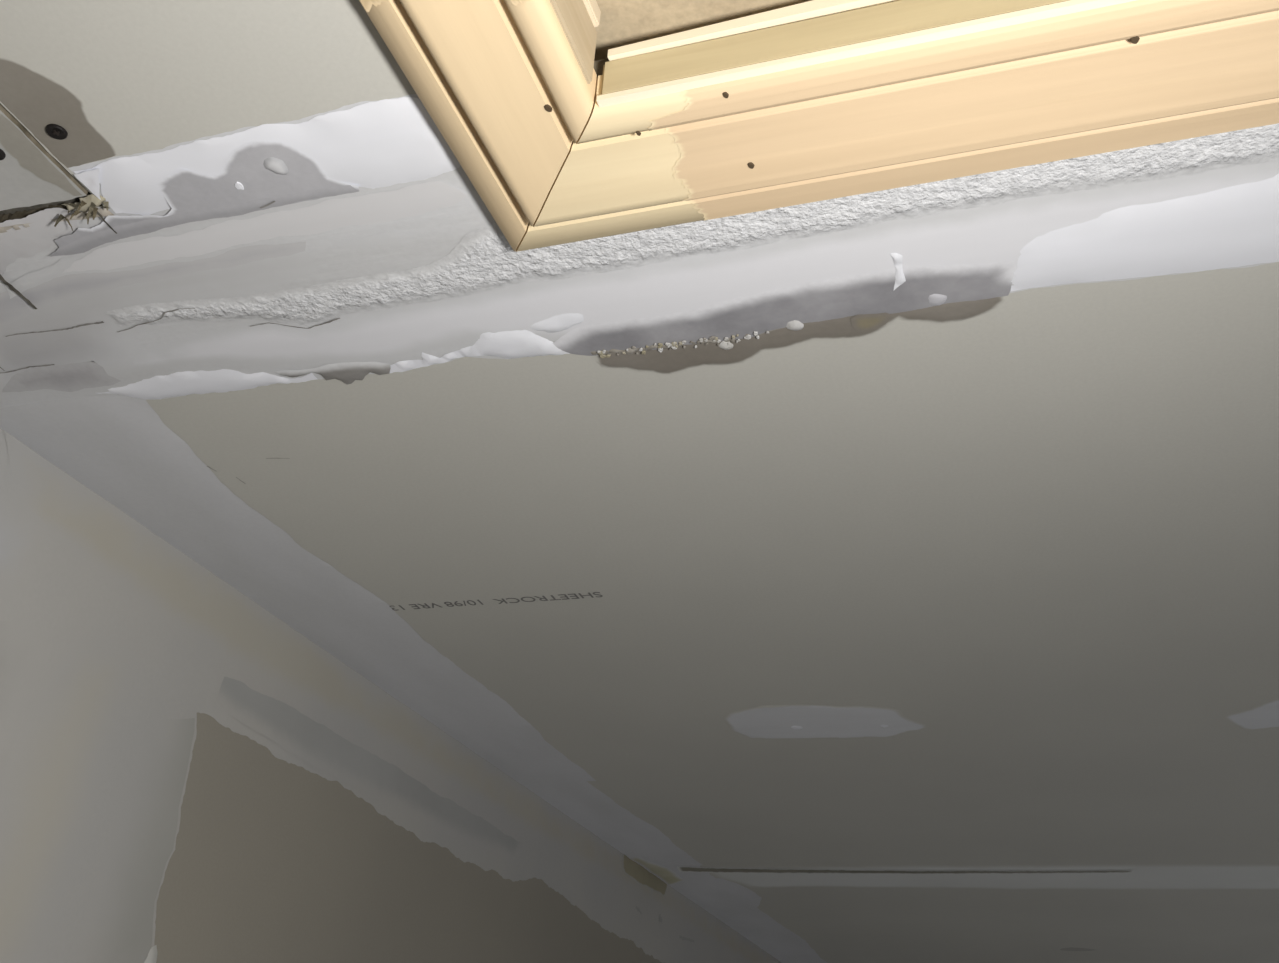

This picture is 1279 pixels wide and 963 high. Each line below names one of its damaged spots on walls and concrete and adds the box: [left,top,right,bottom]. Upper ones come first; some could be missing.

leakage [0,56,117,196]
crack [0,191,117,234]
leakage [49,141,359,257]
crack [0,274,195,337]
crack [252,318,340,329]
leakage [552,260,1016,375]
crack [0,364,54,373]